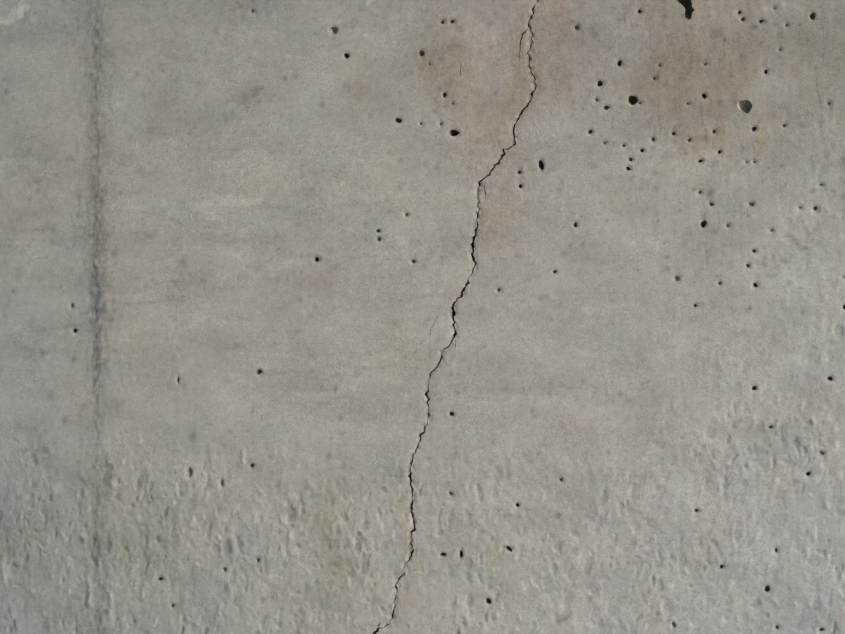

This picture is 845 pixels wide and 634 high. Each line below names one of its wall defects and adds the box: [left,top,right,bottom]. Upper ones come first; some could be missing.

crack [372,0,543,634]